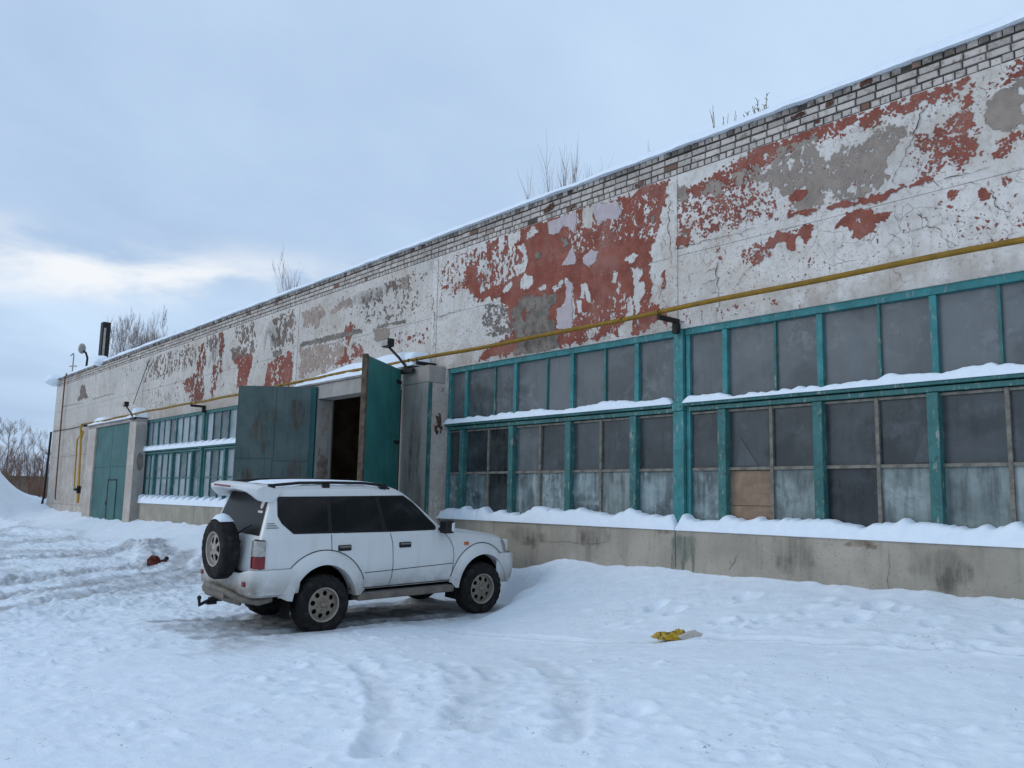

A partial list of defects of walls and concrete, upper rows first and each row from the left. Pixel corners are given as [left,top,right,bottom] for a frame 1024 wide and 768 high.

peeling [122,57,1024,407]
crack [667,200,753,315]
crack [890,108,1009,248]